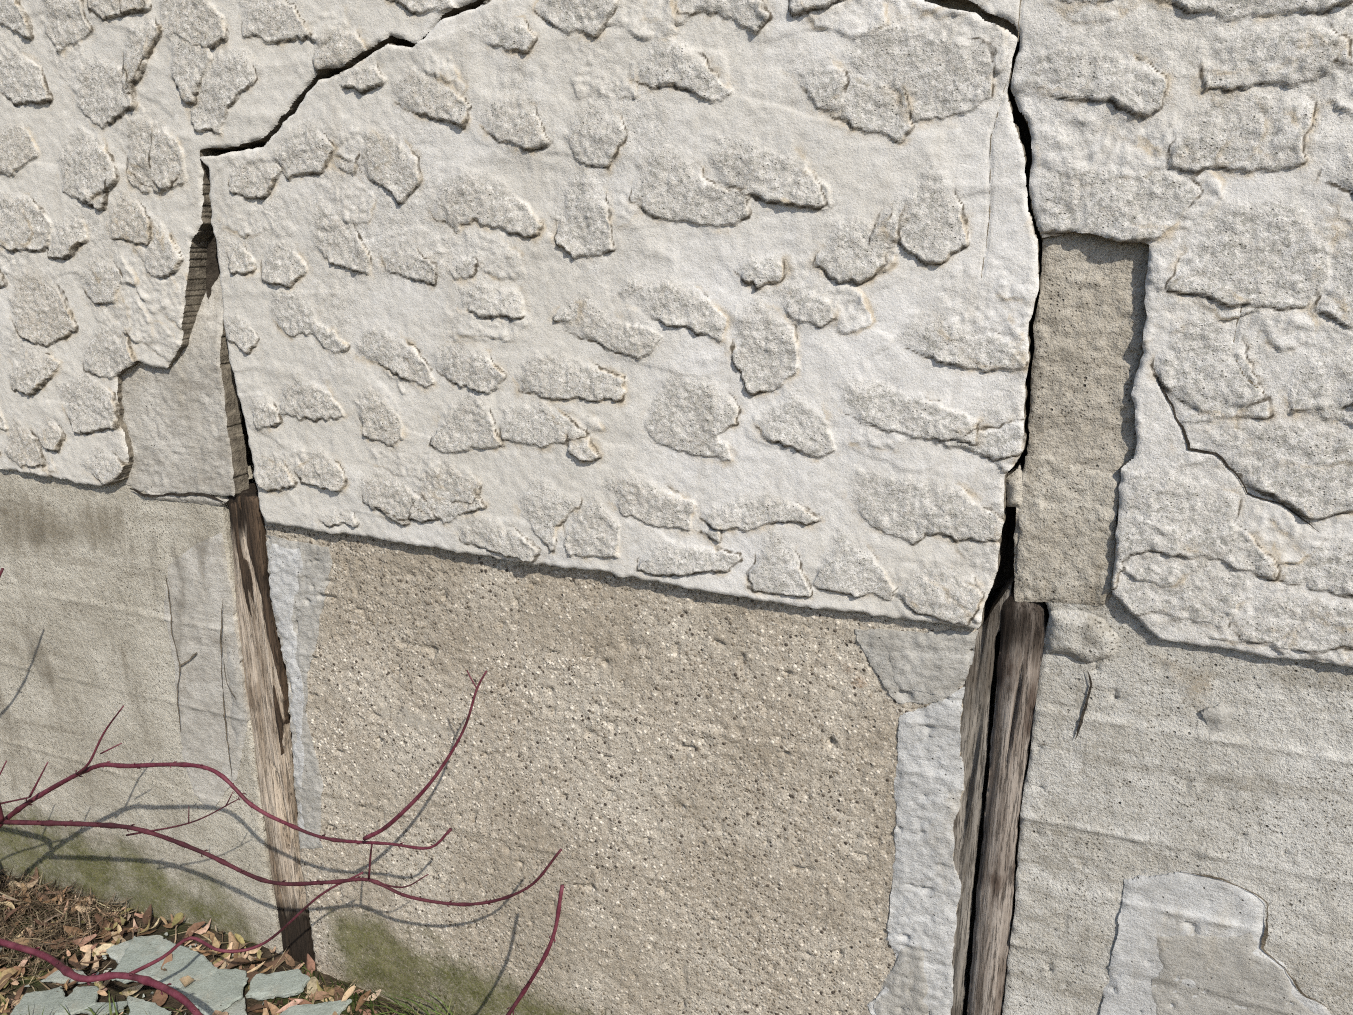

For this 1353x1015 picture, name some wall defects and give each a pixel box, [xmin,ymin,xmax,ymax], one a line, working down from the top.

crack [221,145,265,154]
crack [402,39,415,48]
crack [130,488,225,503]
spalling [121,275,249,506]
crack [206,233,220,300]
crack [924,0,1043,591]
spalling [1006,232,1149,663]
crack [1153,369,1319,532]
peeling [266,535,333,849]
peeling [855,629,978,1015]